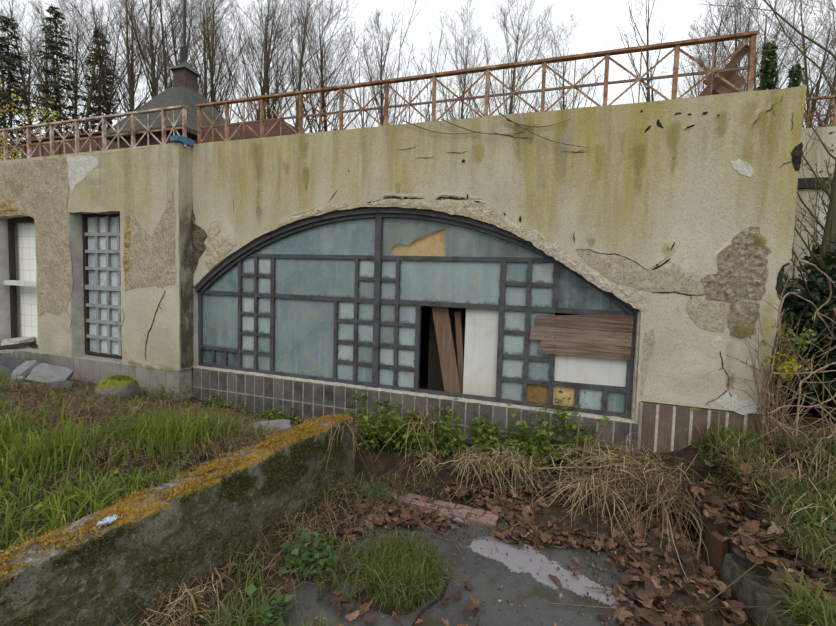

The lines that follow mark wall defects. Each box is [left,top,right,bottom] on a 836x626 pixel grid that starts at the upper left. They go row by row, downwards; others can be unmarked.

flaking render [0,155,99,316]
flaking render [123,187,176,293]
flaking render [366,197,784,348]
crack [568,231,670,271]
crack [651,291,705,299]